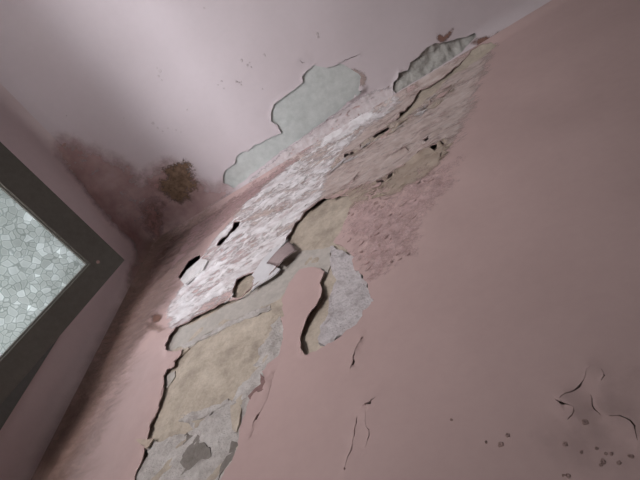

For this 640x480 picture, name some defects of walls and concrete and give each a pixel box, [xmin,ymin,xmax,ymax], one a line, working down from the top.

leakage [31,96,401,480]
spalling [135,33,497,480]